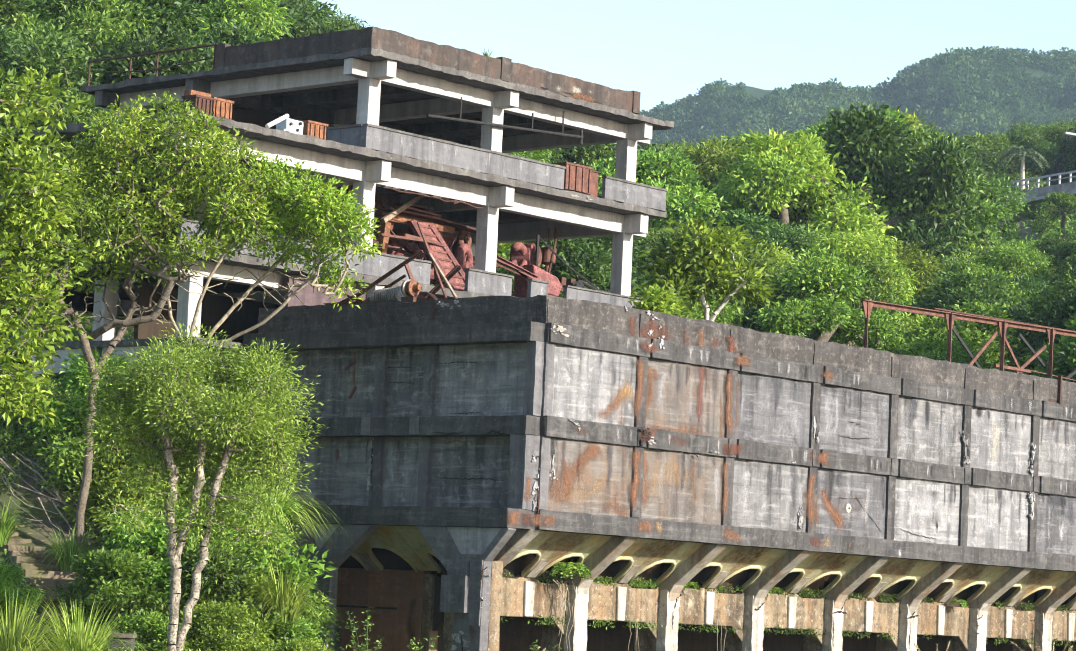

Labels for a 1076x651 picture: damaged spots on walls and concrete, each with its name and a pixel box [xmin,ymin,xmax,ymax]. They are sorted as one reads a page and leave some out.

rust [602,317,666,416]
spalling [646,310,665,349]
rust [687,330,750,366]
rust [631,367,705,506]
rust [720,375,741,511]
water stain [977,409,1007,457]
spalling [531,450,558,513]
rust [549,445,600,501]
rust [806,474,842,528]